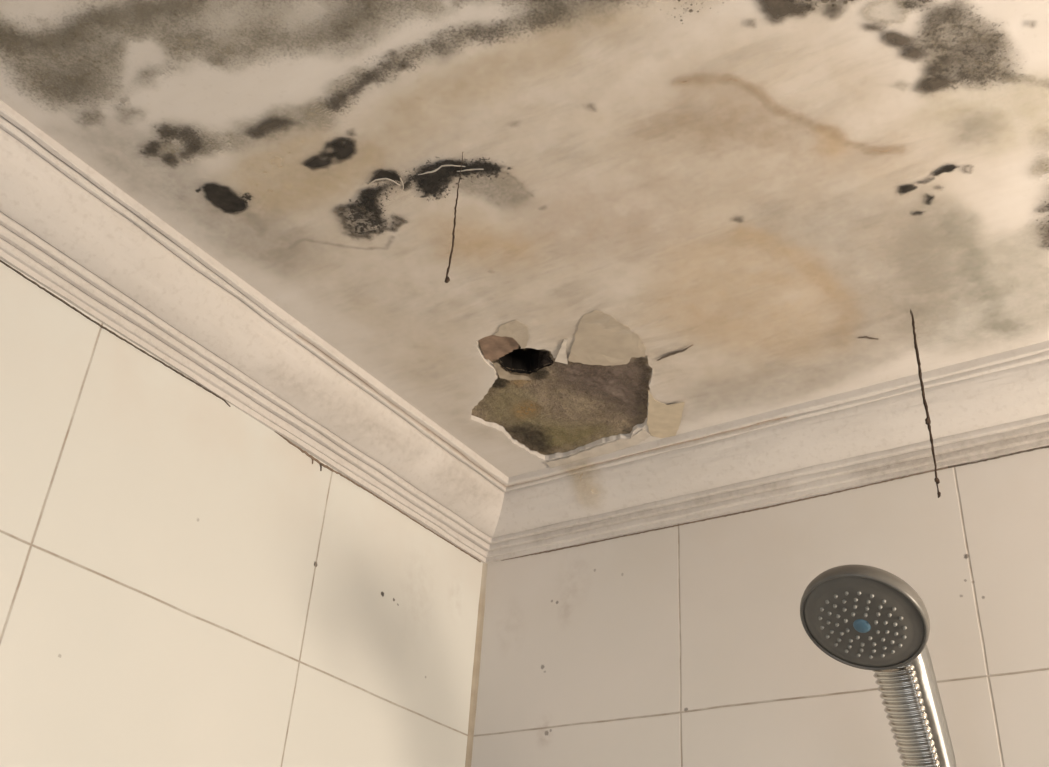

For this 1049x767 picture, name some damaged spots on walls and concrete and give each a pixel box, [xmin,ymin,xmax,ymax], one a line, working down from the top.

damp [0,0,321,98]
damp [140,20,510,169]
damp [760,0,854,22]
damp [867,0,1013,92]
damp [195,184,254,214]
peeling [334,157,512,239]
spalling [471,310,685,468]
crack [274,431,1049,562]